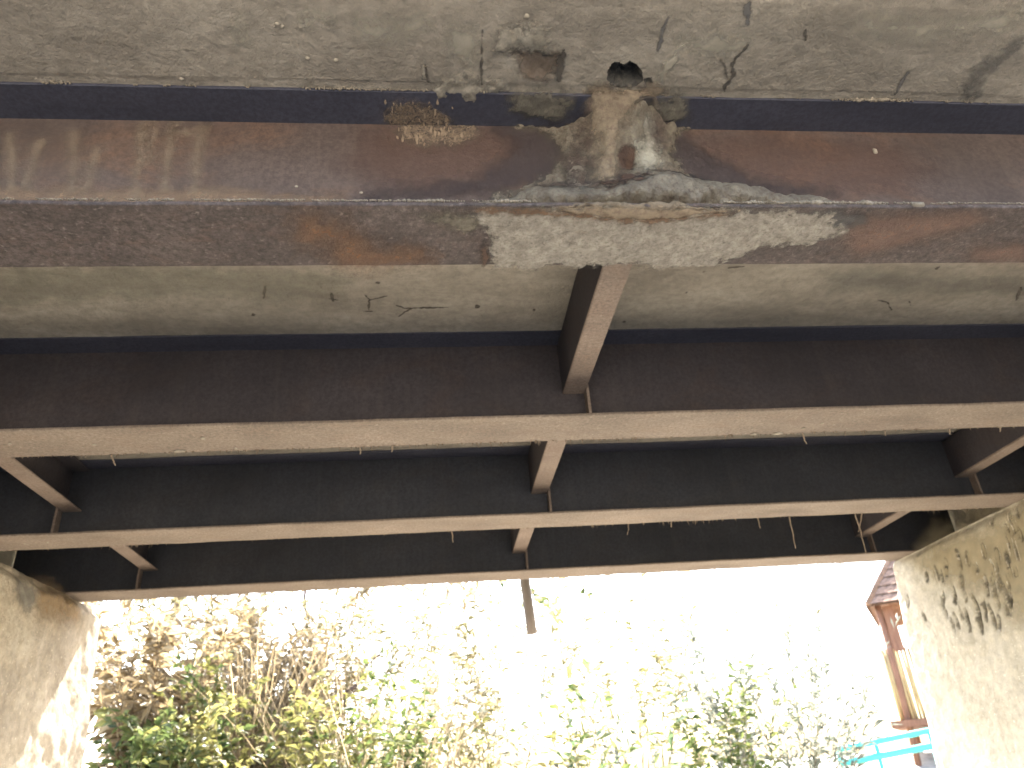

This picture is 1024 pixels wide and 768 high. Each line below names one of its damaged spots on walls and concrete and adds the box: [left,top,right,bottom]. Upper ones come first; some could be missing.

crack [720,2,752,92]
spalling [606,61,653,88]
spalling [616,144,635,170]
rust [0,189,330,202]
rust [851,212,979,253]